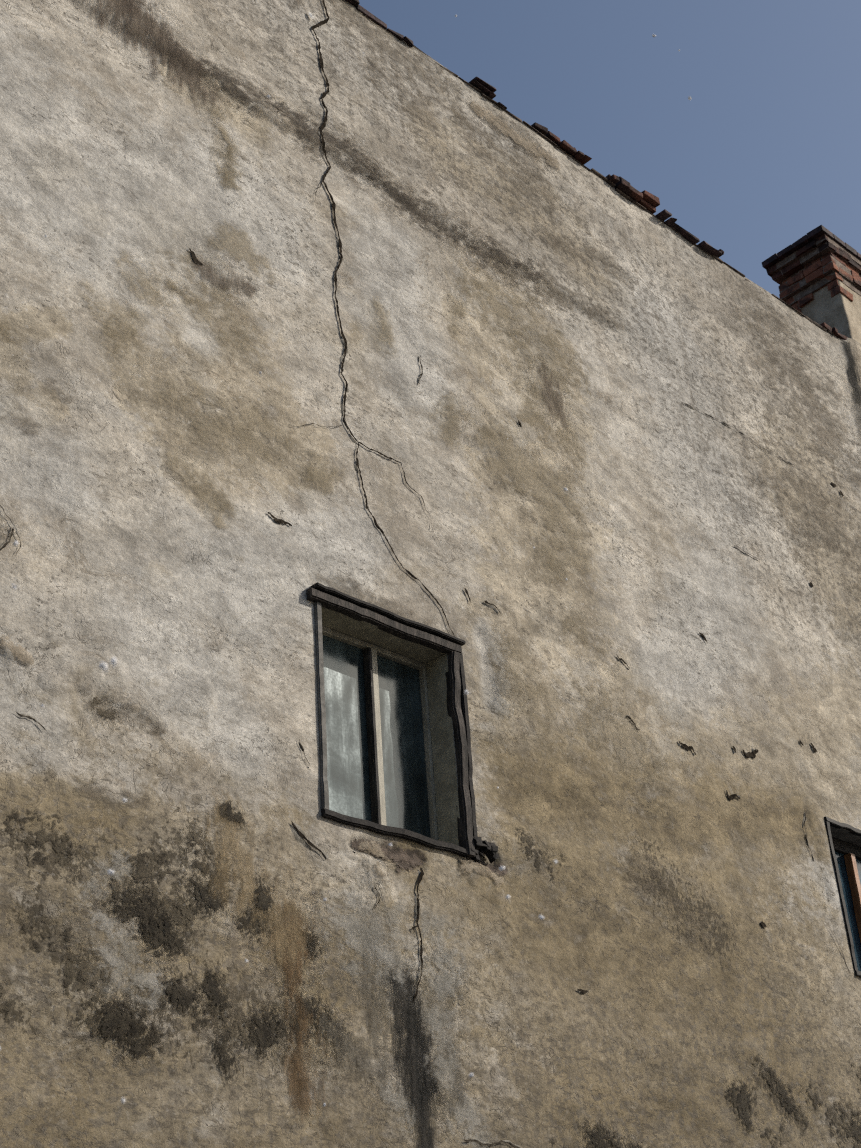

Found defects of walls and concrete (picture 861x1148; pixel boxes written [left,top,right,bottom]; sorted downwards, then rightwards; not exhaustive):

water stain [99,0,586,460]
crack [289,0,455,636]
crack [465,588,501,614]
mould [3,809,74,868]
mould [219,800,245,829]
mould [23,834,347,1084]
crack [412,868,424,1002]
water stain [390,966,441,1148]
mould [724,1055,861,1148]